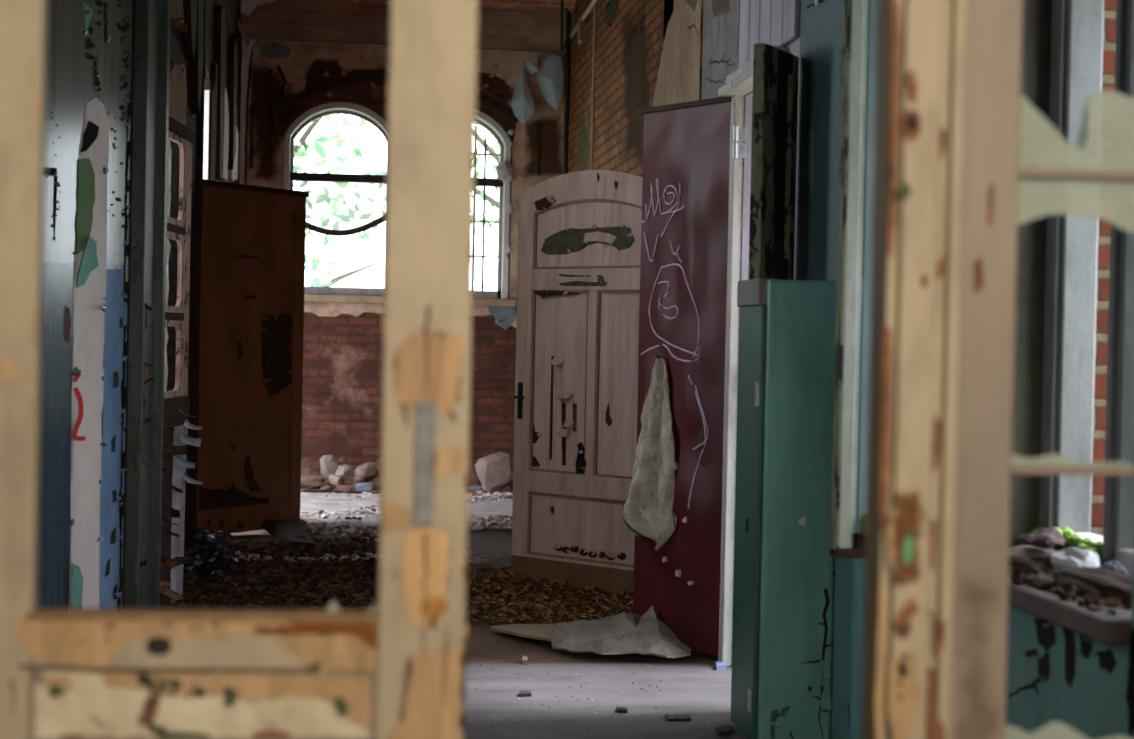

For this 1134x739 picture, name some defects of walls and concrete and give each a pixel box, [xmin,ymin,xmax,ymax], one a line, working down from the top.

peeling [477,55,564,145]
peeling [34,100,61,241]
spalling [496,161,514,185]
peeling [63,0,203,608]
peeling [434,445,469,493]
peeling [97,671,373,732]
crack [800,588,850,739]
peeling [1025,617,1117,688]